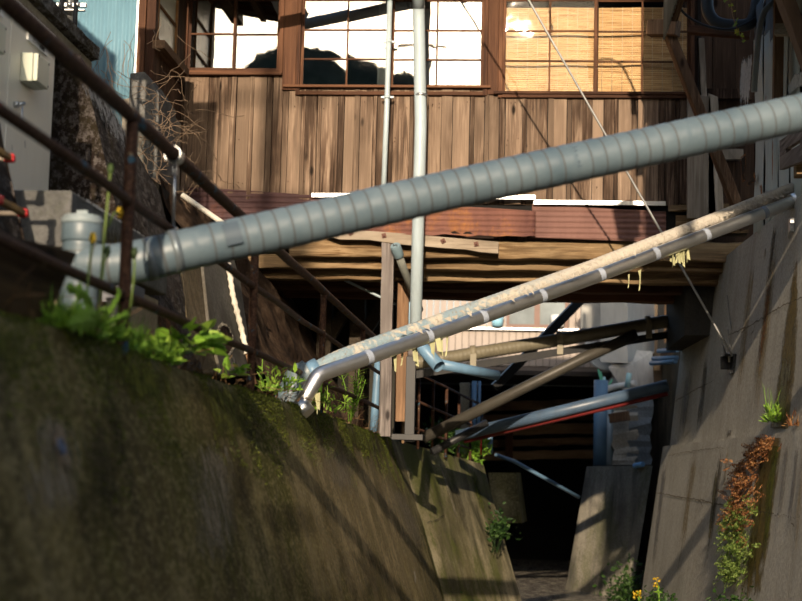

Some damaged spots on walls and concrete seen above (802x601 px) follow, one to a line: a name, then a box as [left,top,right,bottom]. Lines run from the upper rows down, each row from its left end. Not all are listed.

water stain [773,355,791,427]
water stain [748,444,802,576]